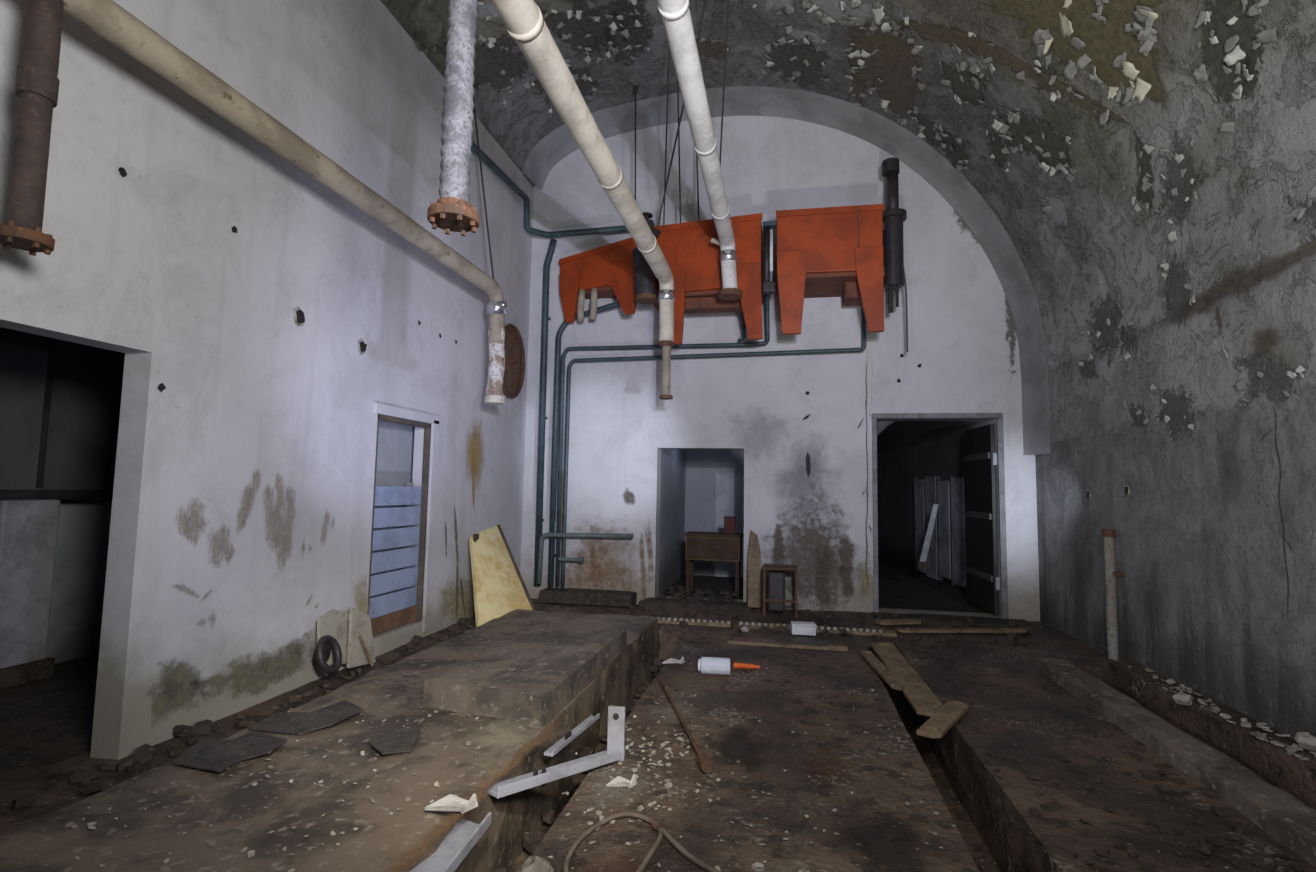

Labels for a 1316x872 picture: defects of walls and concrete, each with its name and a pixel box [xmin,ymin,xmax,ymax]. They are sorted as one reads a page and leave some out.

peeling [473,1,553,113]
peeling [542,0,668,103]
peeling [695,35,729,59]
peeling [752,0,1203,338]
peeling [1078,282,1137,383]
peeling [1123,384,1198,439]
peeling [1221,348,1306,408]
water stain [767,505,871,611]
water stain [149,635,311,717]